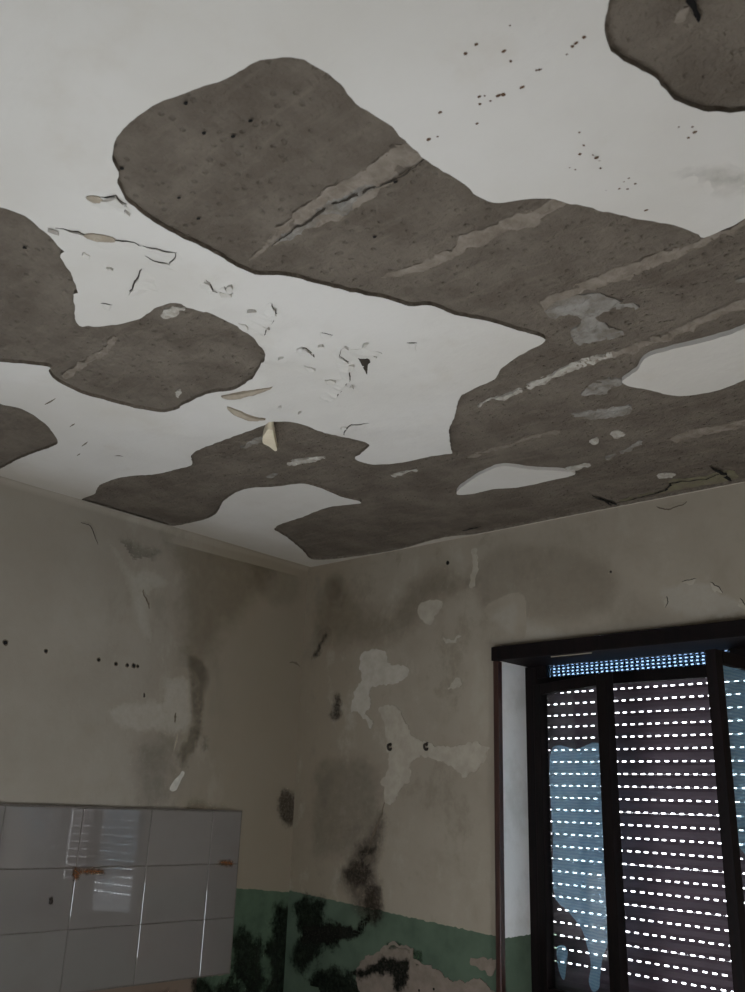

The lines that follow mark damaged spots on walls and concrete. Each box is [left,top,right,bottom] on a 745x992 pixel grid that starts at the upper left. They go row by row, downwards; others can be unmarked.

flaking render [604,0,745,113]
flaking render [0,57,745,560]
peeling [417,600,443,625]
peeling [351,648,490,805]
corrosion [72,867,104,881]
damp [191,802,385,992]
peeling [351,941,496,992]